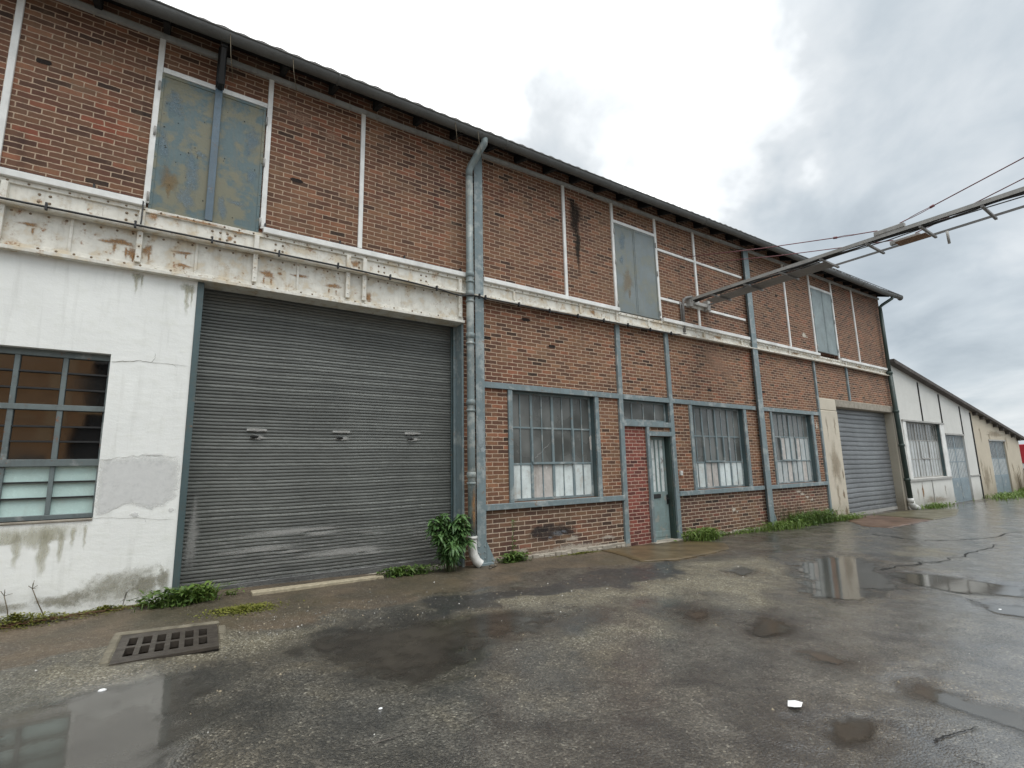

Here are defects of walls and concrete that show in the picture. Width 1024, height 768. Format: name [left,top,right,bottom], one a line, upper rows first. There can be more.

corrosion [100,239,151,262]
leakage [4,528,86,561]
crack [874,531,1022,603]
leakage [38,569,168,605]